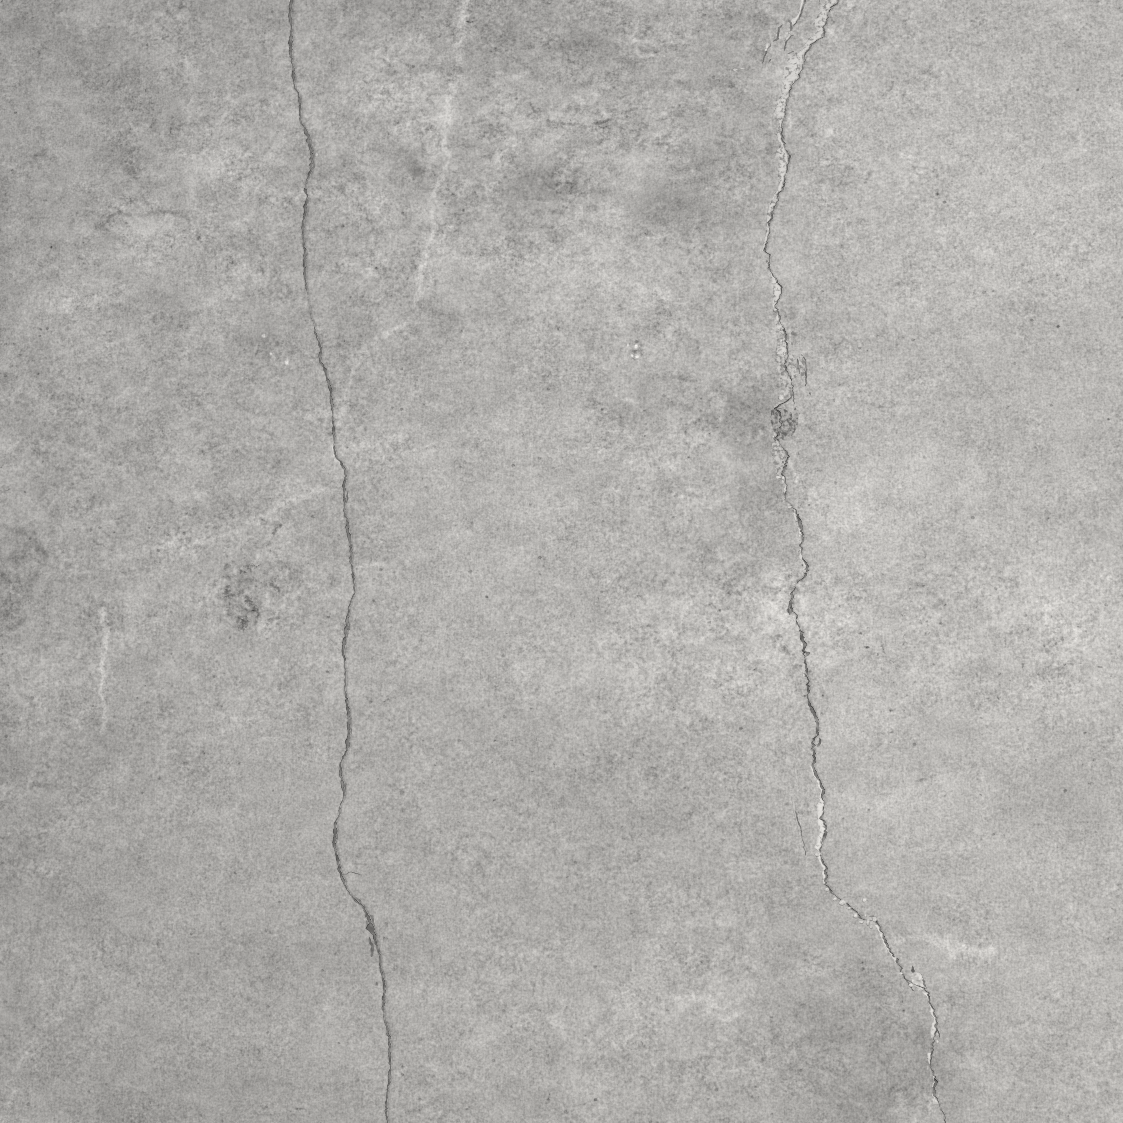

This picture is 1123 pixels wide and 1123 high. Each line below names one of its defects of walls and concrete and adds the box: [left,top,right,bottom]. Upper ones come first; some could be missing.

crack [287,0,392,1123]
crack [732,0,947,1123]